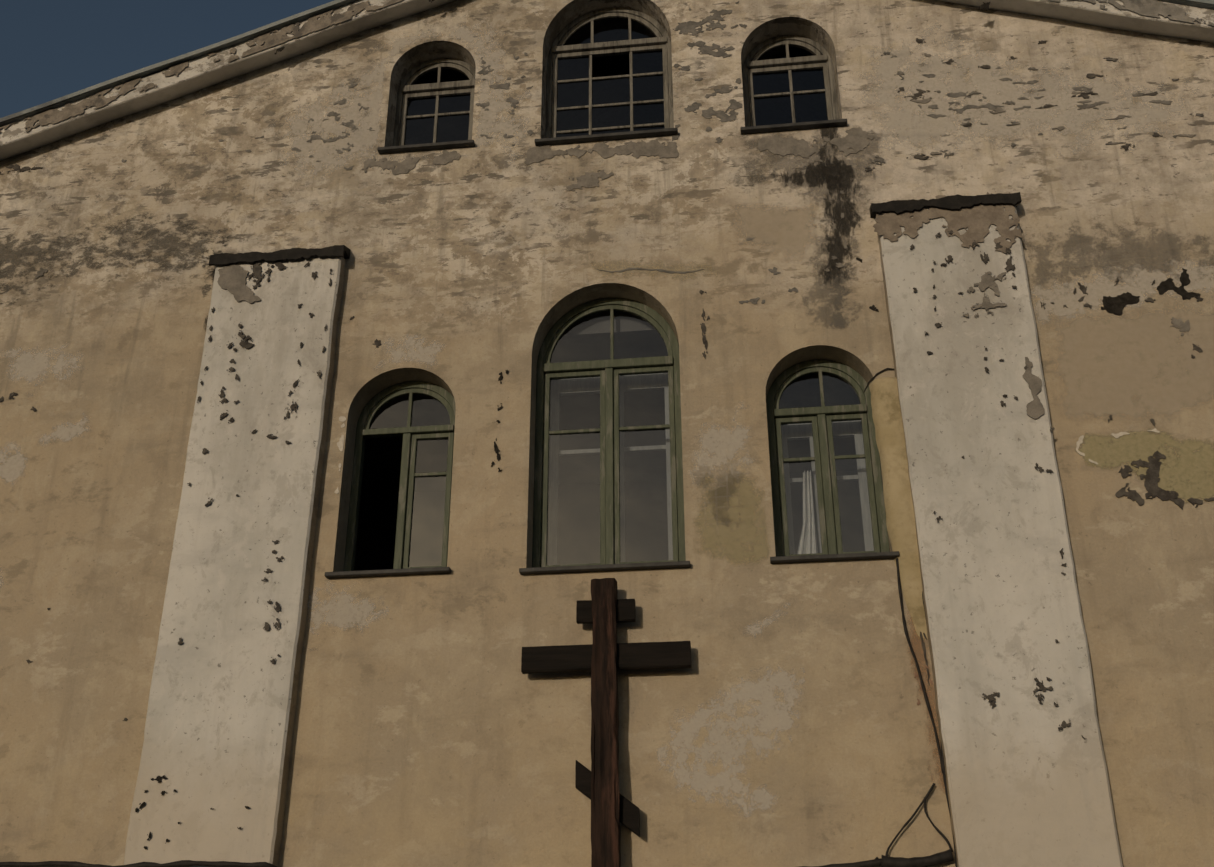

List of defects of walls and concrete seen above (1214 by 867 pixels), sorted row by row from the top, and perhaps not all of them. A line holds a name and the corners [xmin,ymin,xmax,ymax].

peeling [673,1,747,58]
peeling [480,63,742,193]
peeling [880,52,1057,127]
flaking render [1071,57,1135,150]
water stain [773,127,860,284]
water stain [0,215,229,306]
peeling [217,261,286,303]
peeling [873,192,1023,336]
flaking render [1040,268,1204,316]
peeling [1000,357,1045,419]
flaking render [1076,415,1214,510]
peeling [1033,677,1059,707]